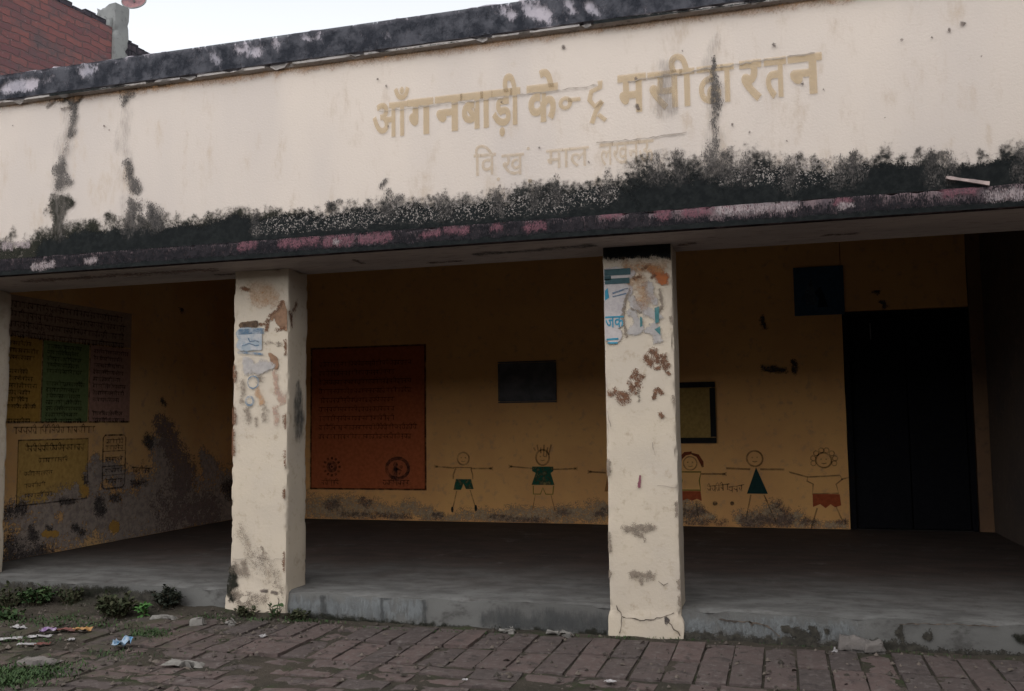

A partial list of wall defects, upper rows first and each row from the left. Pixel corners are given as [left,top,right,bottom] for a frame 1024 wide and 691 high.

water stain [0,0,1024,283]
flaking render [233,300,298,429]
peeling [607,347,676,419]
water stain [2,397,469,627]
crack [616,605,680,636]